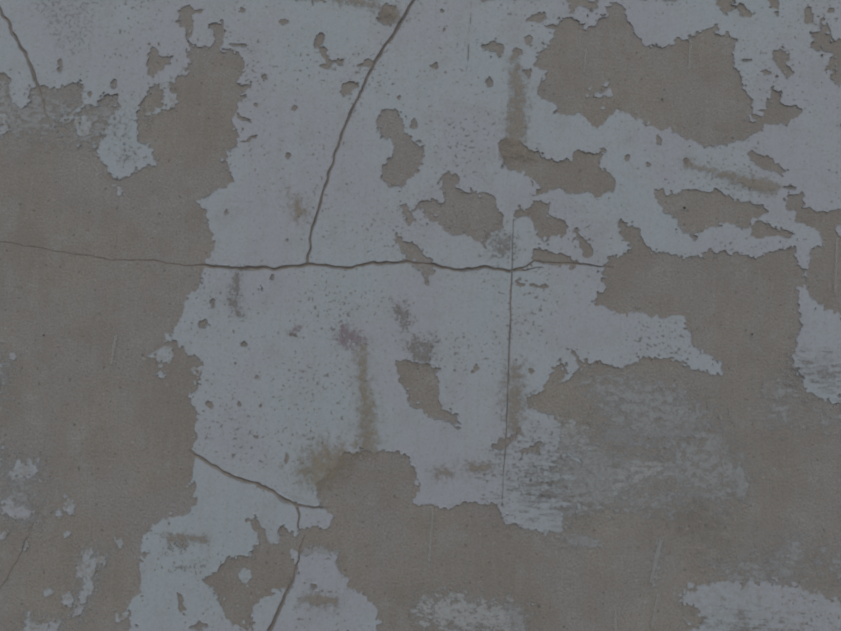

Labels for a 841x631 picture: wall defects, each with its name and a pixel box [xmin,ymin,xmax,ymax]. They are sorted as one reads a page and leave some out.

peeling [314,33,344,70]
peeling [340,81,359,96]
peeling [376,95,425,187]
peeling [481,0,810,147]
peeling [804,7,841,85]
peeling [0,5,257,631]
crack [0,0,613,500]
peeling [173,138,841,631]
crack [189,449,328,631]